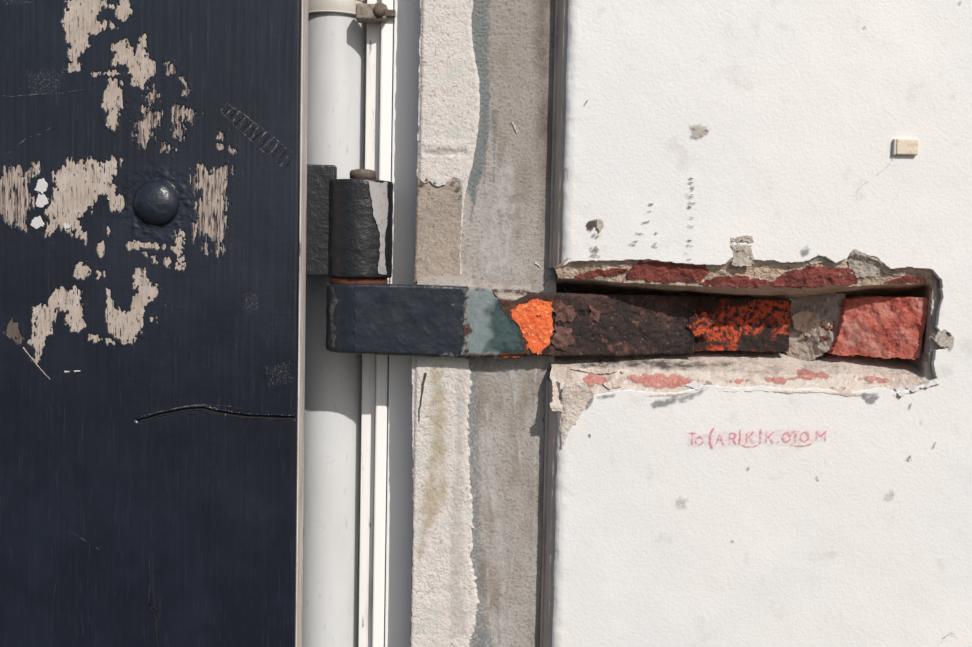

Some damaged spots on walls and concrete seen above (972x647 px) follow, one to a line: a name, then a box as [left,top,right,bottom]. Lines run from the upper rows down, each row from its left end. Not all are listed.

peeling [0,132,237,379]
peeling [62,0,195,153]
spalling [413,177,462,288]
damp [468,0,515,274]
corrosion [466,289,601,358]
spalling [535,235,954,449]